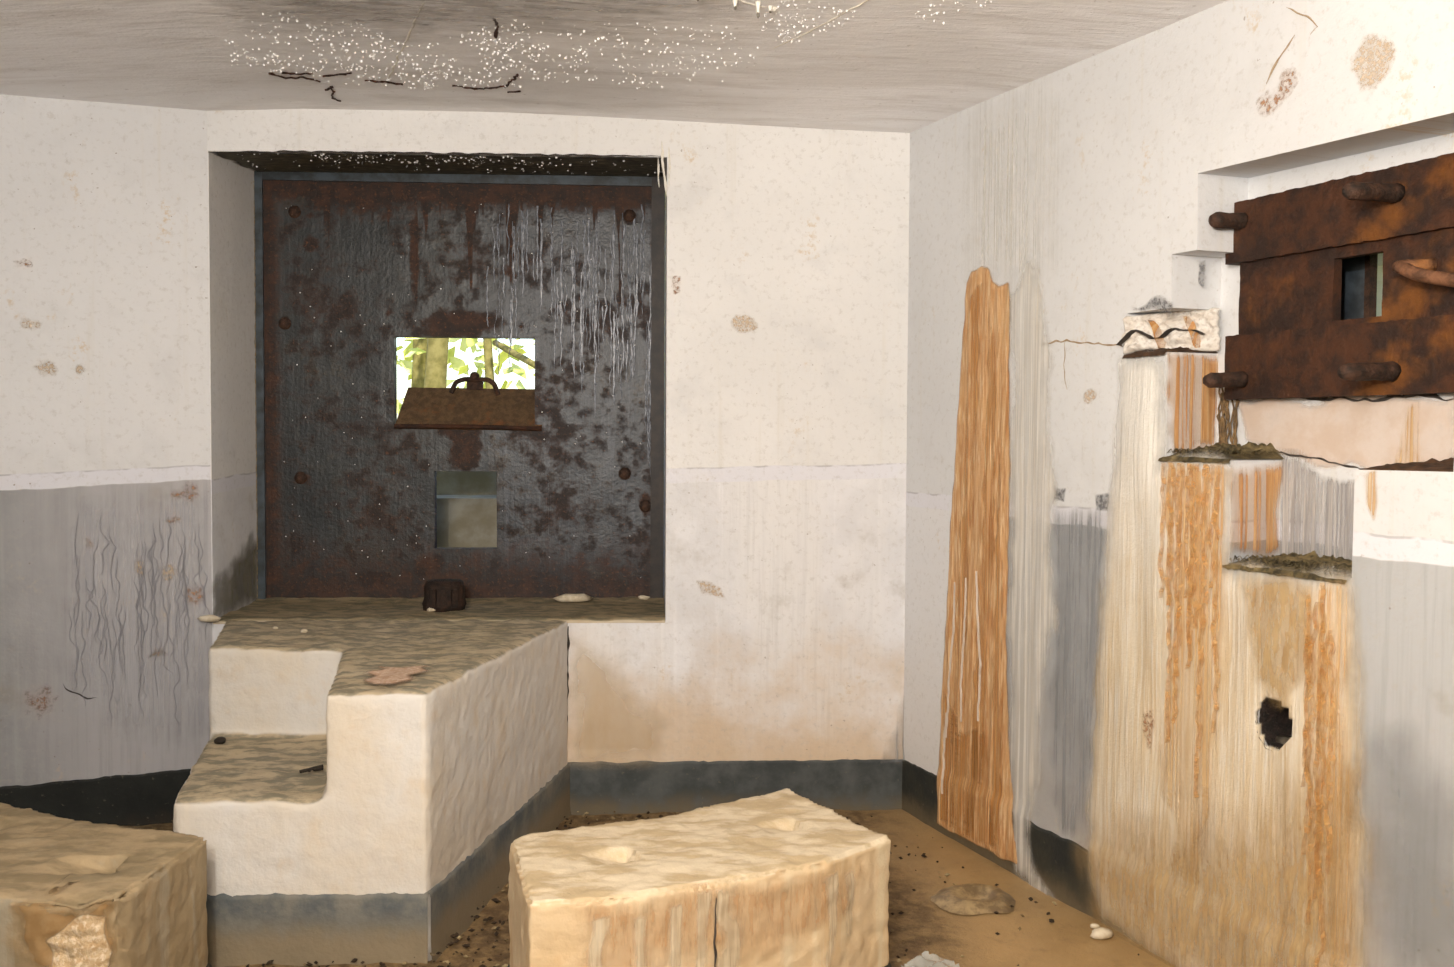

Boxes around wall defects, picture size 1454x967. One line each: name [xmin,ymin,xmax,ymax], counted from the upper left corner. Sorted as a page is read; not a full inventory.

crack [1043,339,1123,388]
spalling [1116,298,1220,354]
rust [1167,355,1218,450]
rust [937,267,1019,865]
damp [1009,265,1101,894]
rust [1143,467,1281,877]
rust [1248,583,1307,696]